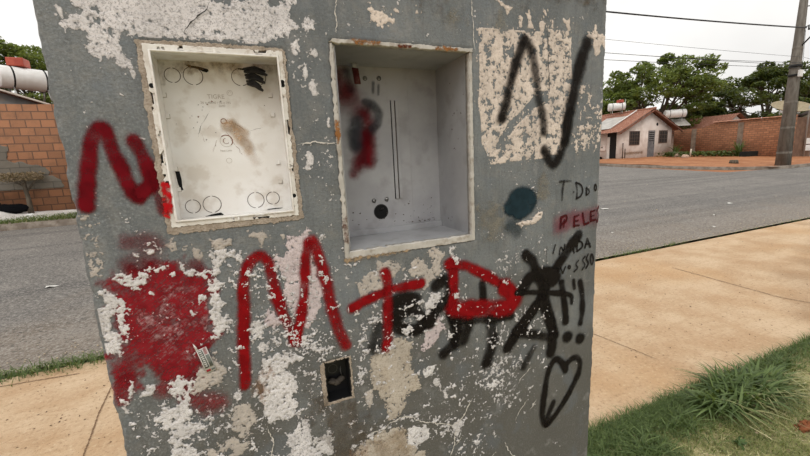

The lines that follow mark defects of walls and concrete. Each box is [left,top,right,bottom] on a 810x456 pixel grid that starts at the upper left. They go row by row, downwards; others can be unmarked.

peeling [54,0,337,208]
peeling [367,0,403,29]
peeling [474,9,605,185]